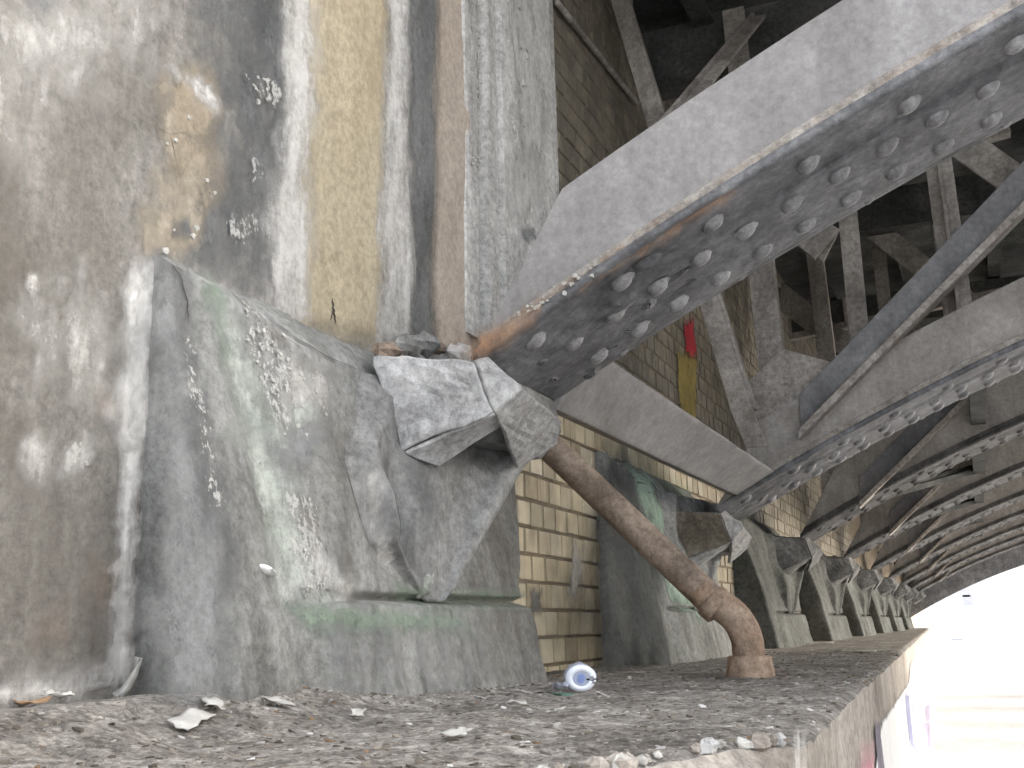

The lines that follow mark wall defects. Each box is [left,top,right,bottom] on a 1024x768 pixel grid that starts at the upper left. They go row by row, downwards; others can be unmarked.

crack [169,261,189,323]
damp [188,0,471,603]
peeling [230,289,328,448]
crack [264,312,359,370]
spalling [372,330,478,363]
corrosion [471,316,530,354]